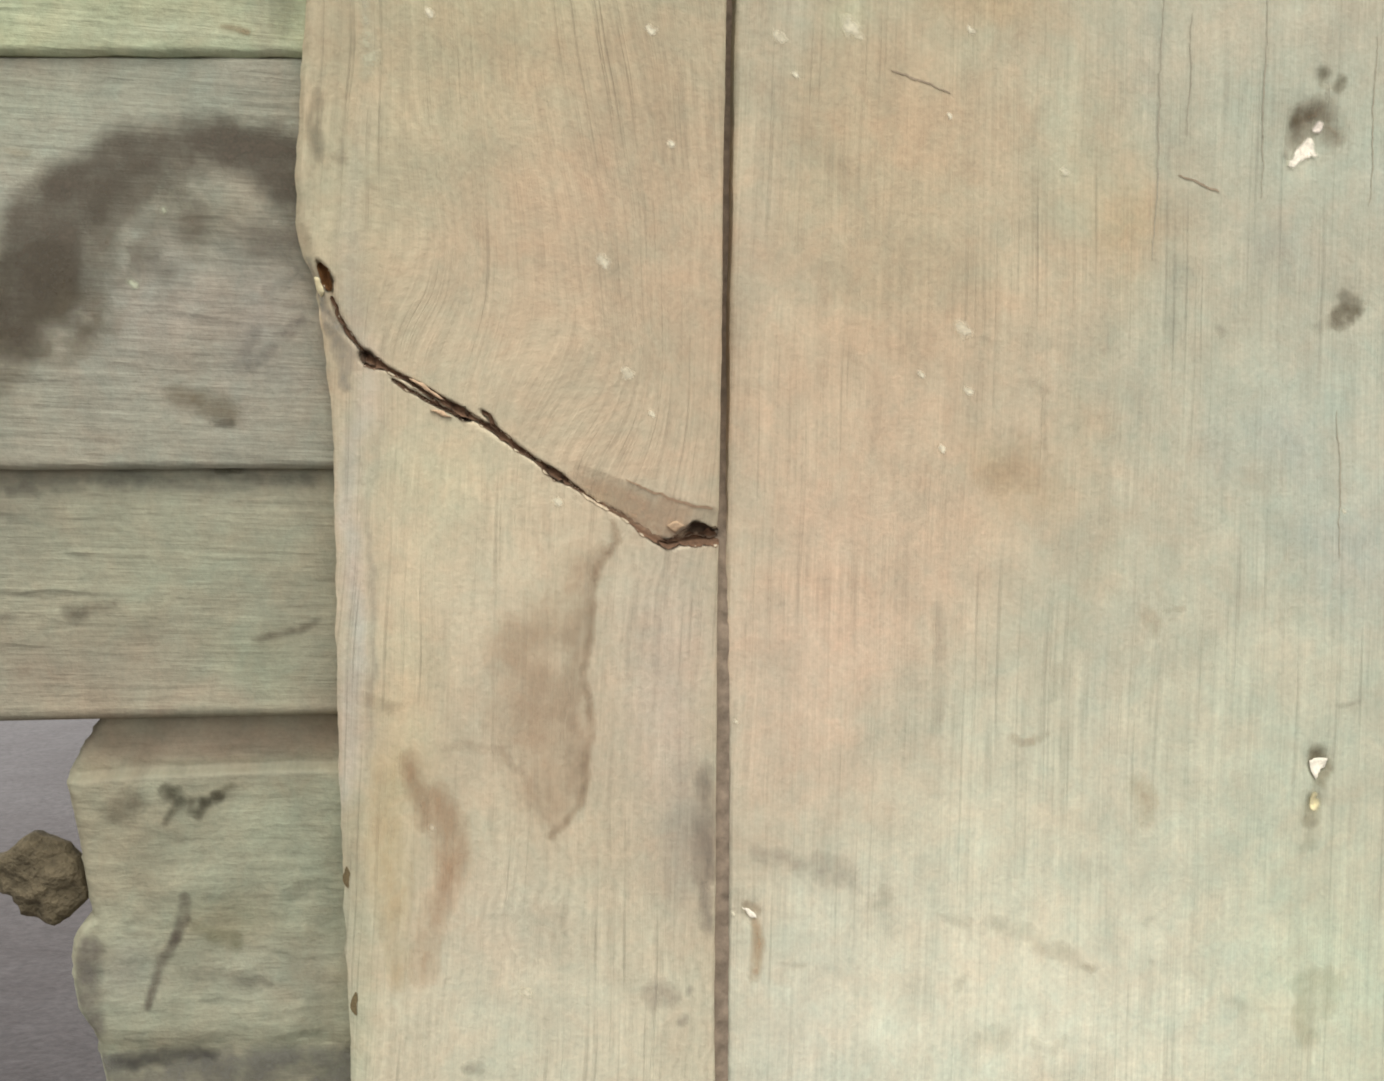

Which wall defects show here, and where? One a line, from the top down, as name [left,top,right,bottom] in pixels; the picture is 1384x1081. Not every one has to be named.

damp [0,121,297,352]
crack [330,296,719,550]